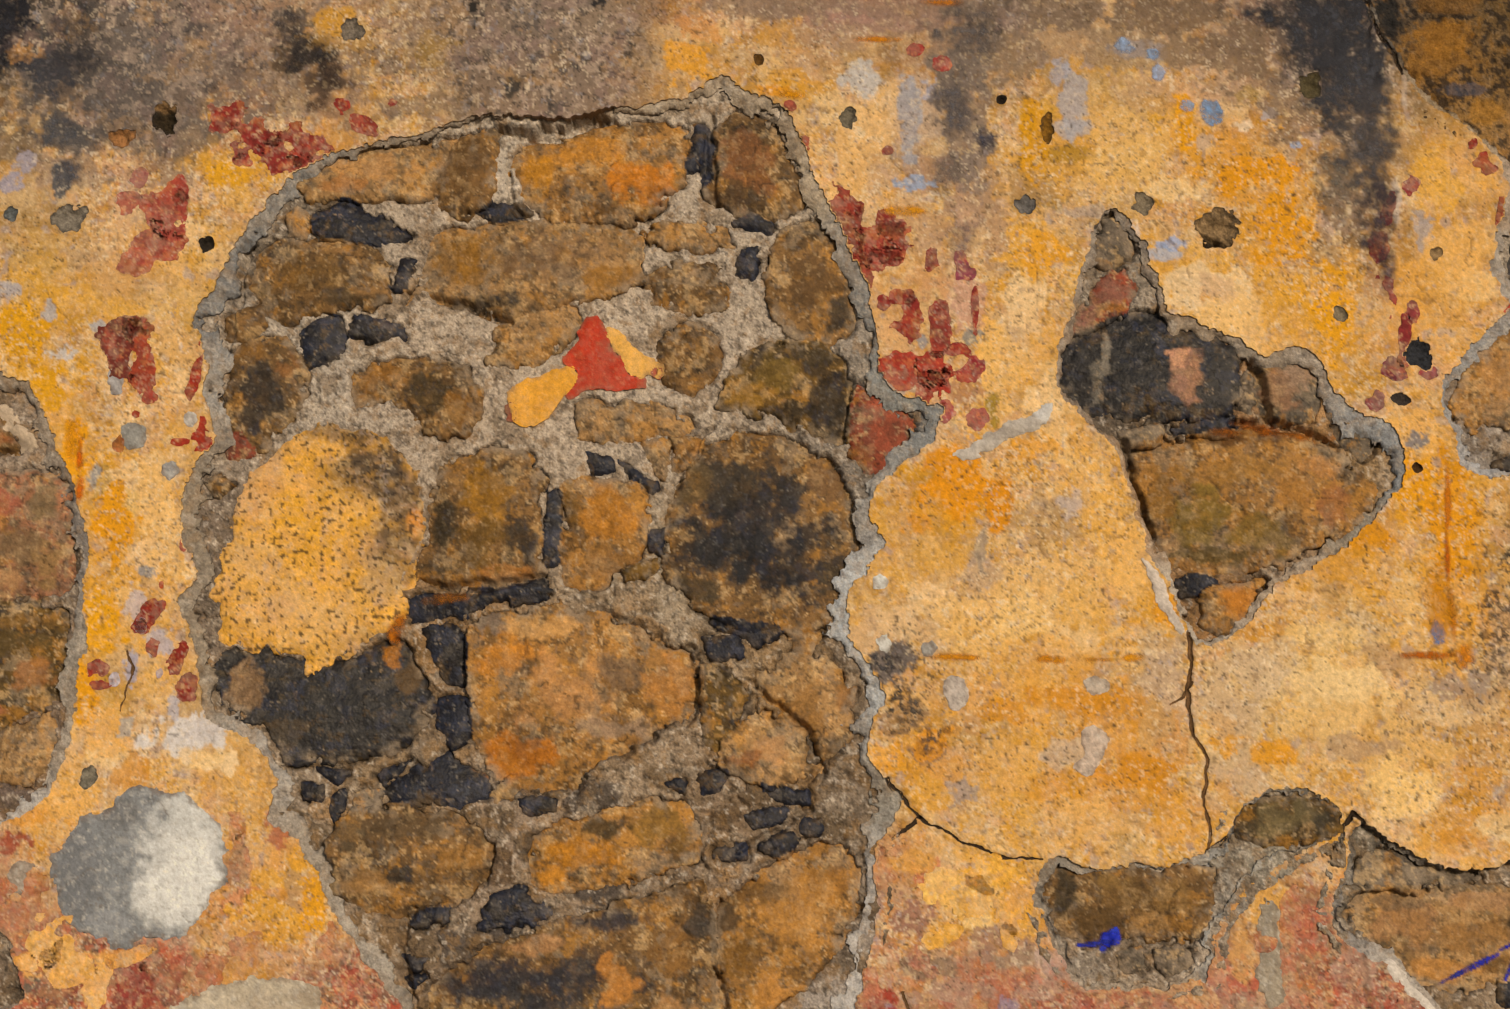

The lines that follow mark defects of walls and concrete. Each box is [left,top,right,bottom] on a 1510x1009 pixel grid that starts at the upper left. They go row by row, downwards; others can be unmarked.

damp [277,11,337,110]
spalling [1040,112,1054,144]
damp [1244,0,1400,278]
peeling [94,315,158,418]
spalling [1056,0,1510,646]
spalling [0,371,120,848]
spalling [108,75,990,1009]
peeling [0,865,272,1009]
crack [886,776,1043,860]
crack [1170,631,1228,854]
spalling [903,786,1510,1009]
crack [1342,810,1364,831]